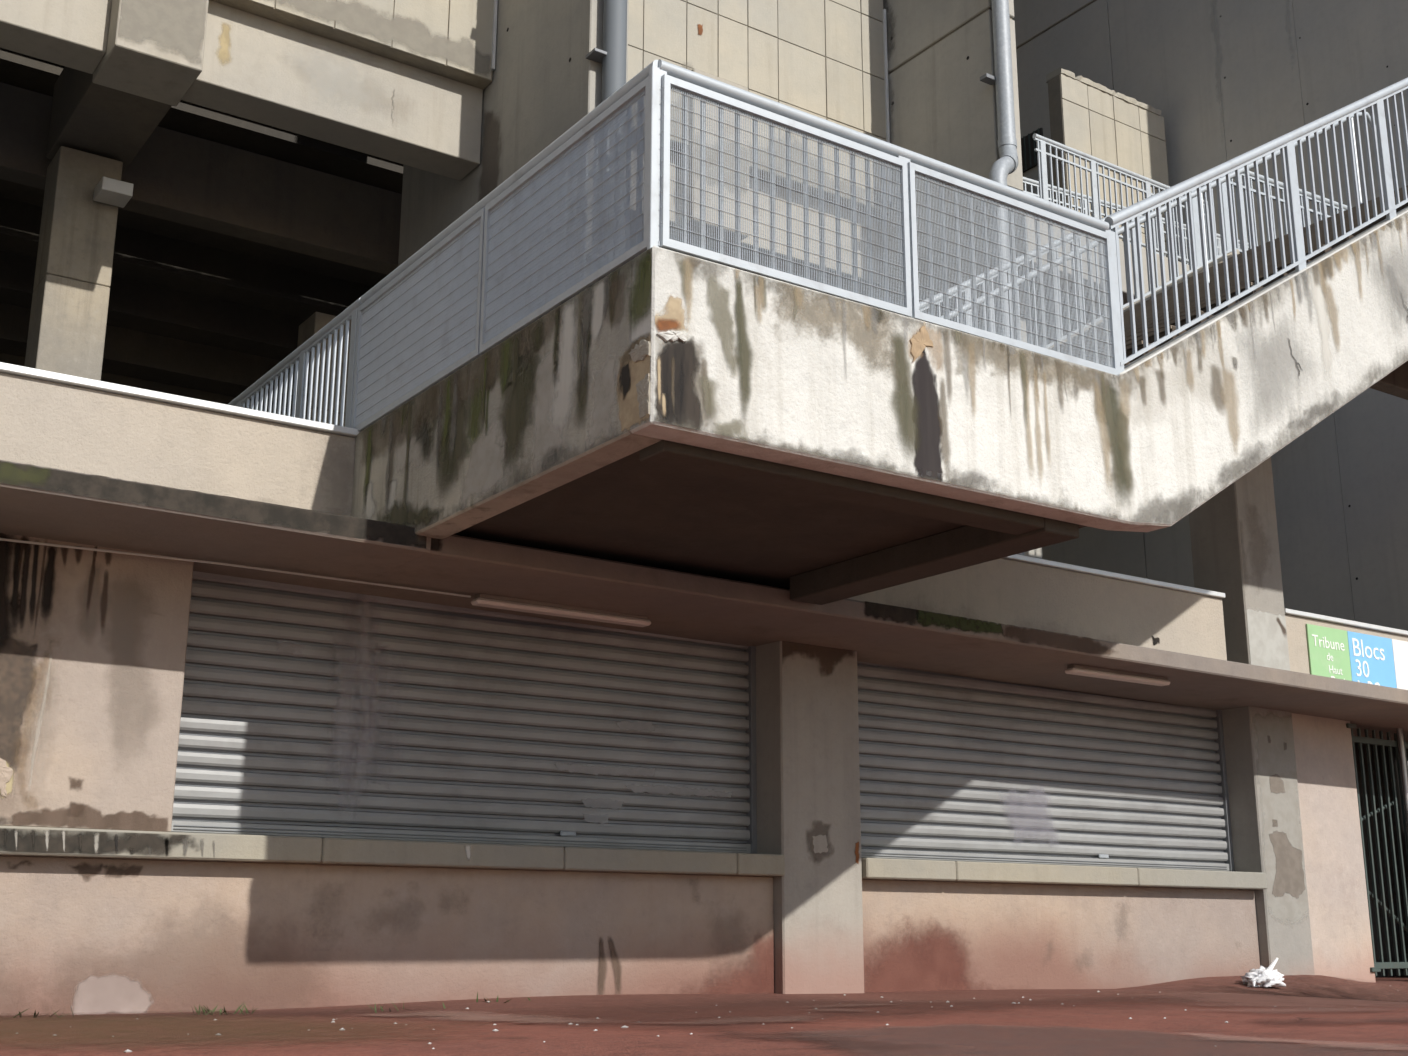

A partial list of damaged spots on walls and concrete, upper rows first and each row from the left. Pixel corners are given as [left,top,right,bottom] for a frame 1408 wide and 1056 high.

damp [219,24,230,63]
damp [1227,295,1268,327]
spalling [617,296,709,431]
damp [673,253,1144,501]
damp [1280,357,1408,448]
damp [1138,497,1193,522]
damp [1210,448,1260,497]
damp [0,533,111,647]
damp [4,779,215,879]
peeling [812,835,828,854]